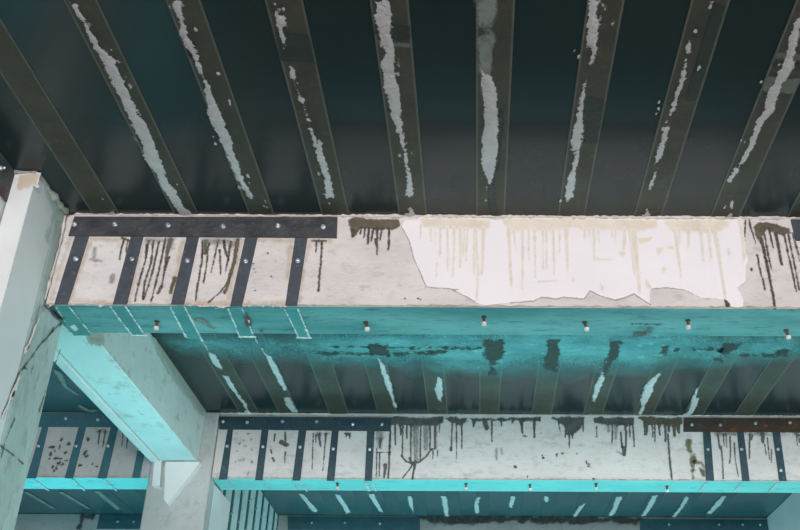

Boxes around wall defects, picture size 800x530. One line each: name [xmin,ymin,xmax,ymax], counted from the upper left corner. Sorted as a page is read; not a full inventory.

leakage [477,0,497,77]
flaking render [374,0,414,197]
flaking render [649,29,697,190]
flaking render [727,18,800,183]
leakage [418,111,800,309]
leakage [134,238,177,302]
leakage [195,238,239,303]
leakage [312,239,326,292]
peeling [297,200,800,309]
leakage [376,416,541,480]
leakage [552,416,682,480]
rust [706,421,800,432]